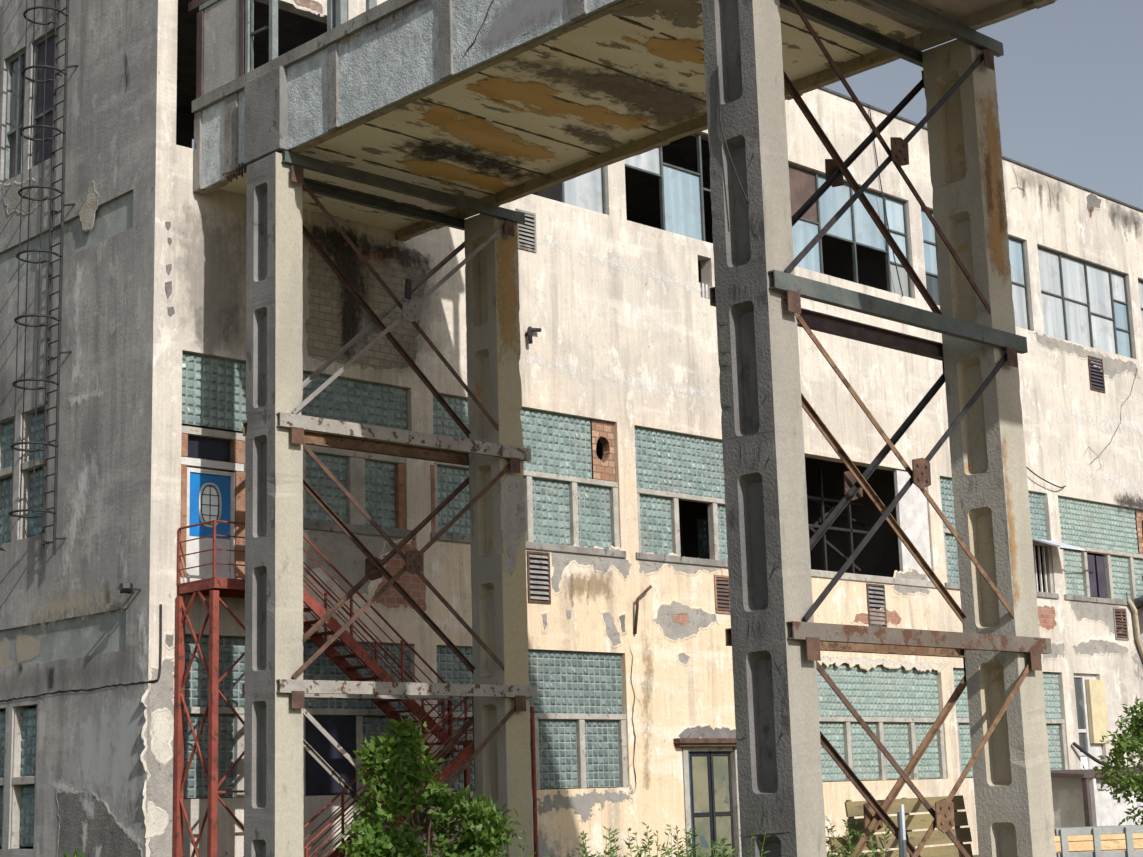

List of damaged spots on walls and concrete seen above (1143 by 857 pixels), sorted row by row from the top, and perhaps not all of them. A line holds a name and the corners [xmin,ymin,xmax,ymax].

crack [463,0,493,57]
peeling [610,0,705,65]
peeling [467,75,660,131]
corrosion [979,98,1010,282]
damp [305,226,429,357]
crack [1086,370,1137,469]
flaking render [500,473,527,576]
flaking render [549,544,724,596]
flaking render [600,610,627,649]
flaking render [651,599,719,667]
flaking render [53,631,175,857]
peeling [537,784,634,822]